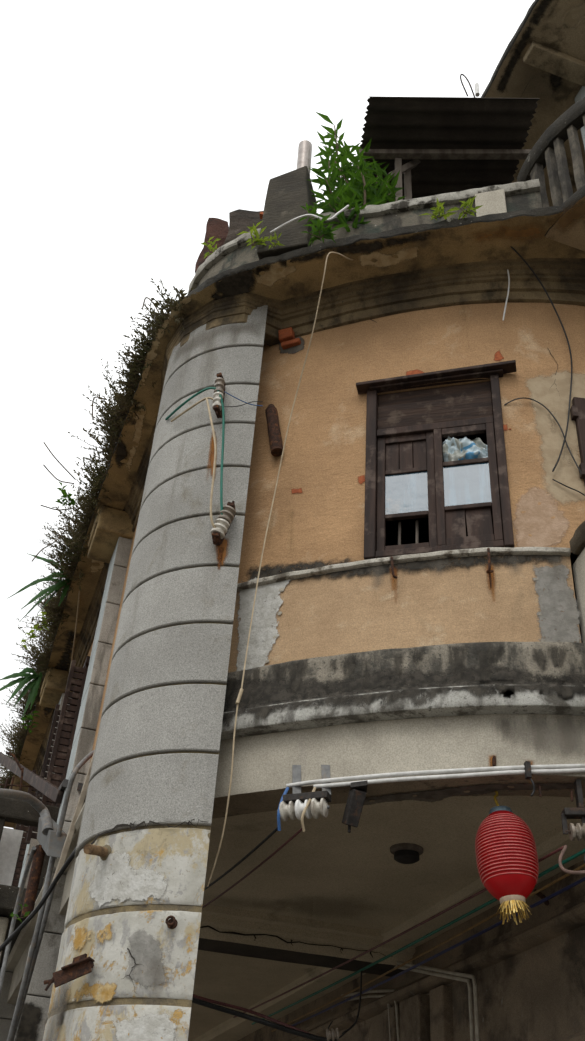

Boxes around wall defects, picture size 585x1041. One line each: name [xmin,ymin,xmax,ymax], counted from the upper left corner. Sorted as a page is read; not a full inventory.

leakage [497,0,552,92]
corrosion [216,539,228,569]
peeling [236,578,290,671]
leakage [223,646,585,725]
peeling [88,852,167,908]
peeling [71,923,112,950]
peeling [64,930,166,1004]
peeling [113,1013,177,1041]